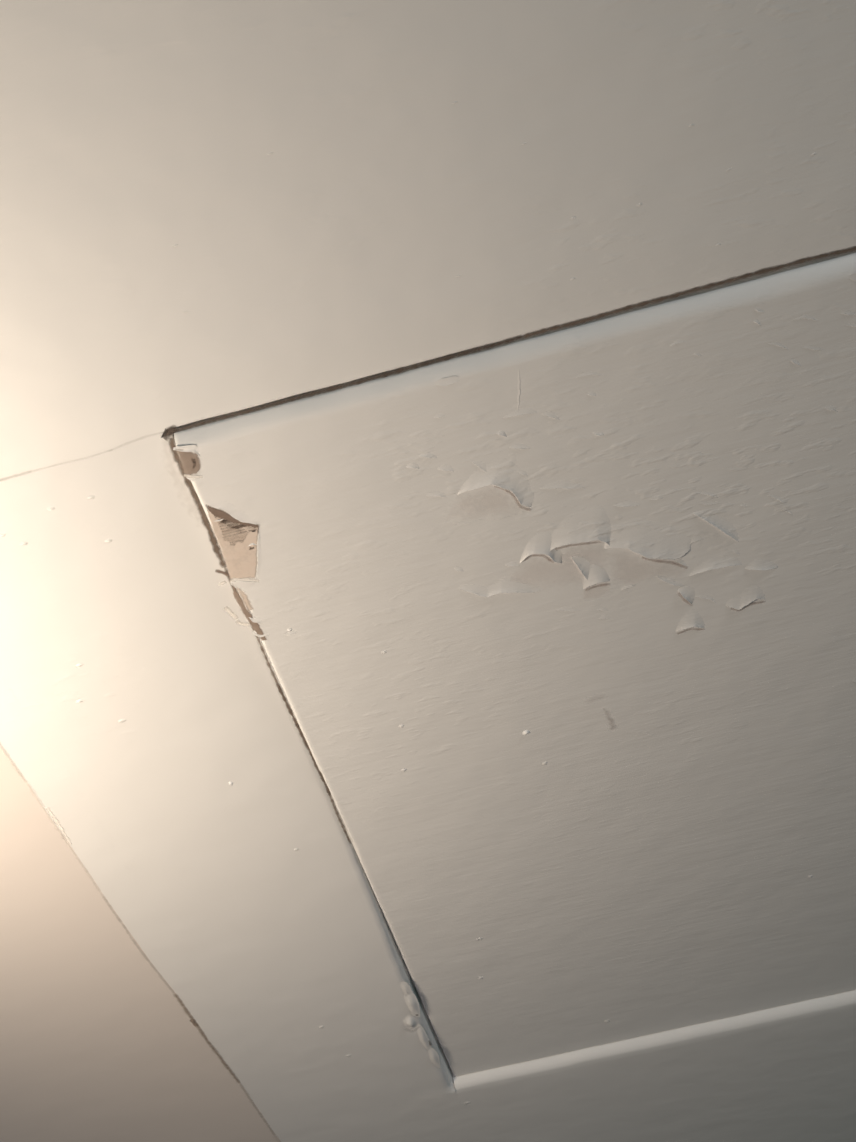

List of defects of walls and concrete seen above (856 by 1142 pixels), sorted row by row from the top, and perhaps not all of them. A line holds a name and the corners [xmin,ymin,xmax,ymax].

peeling [173,445,203,482]
peeling [204,500,269,640]